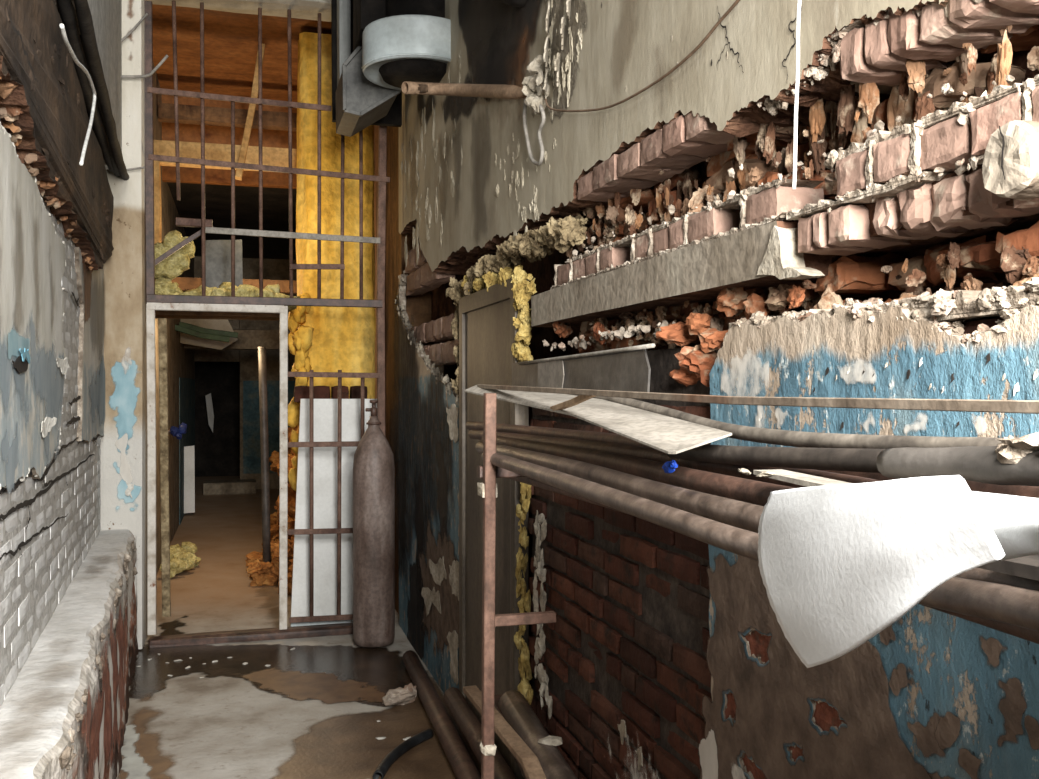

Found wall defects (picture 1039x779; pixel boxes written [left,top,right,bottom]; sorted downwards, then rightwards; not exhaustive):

peeling [494,134,556,240]
spalling [542,0,1039,428]
peeling [0,315,69,493]
crack [0,396,99,560]
peeling [90,348,141,511]
spalling [395,243,459,443]
peeling [904,414,927,433]
damp [93,543,457,779]
peeling [407,519,459,686]
damp [426,671,481,775]
peeling [702,554,982,779]
peeling [997,677,1039,750]